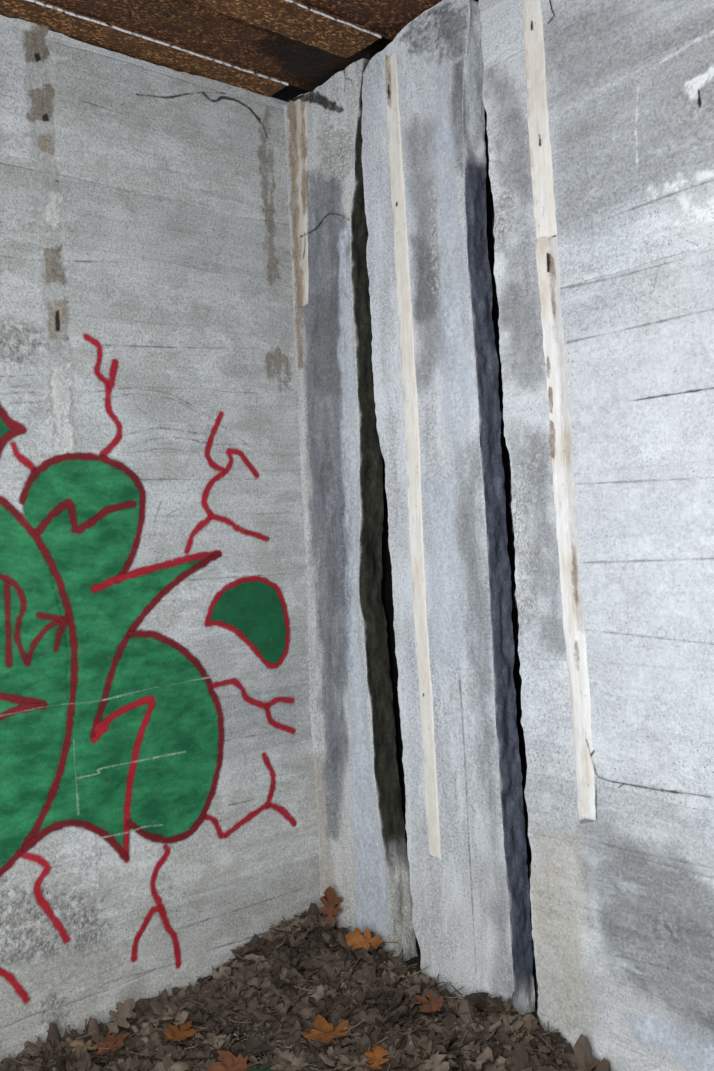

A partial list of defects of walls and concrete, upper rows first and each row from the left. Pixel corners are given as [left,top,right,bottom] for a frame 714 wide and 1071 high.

crack [136,92,267,137]
water stain [551,12,714,225]
water stain [303,126,389,949]
crack [381,455,407,843]
crack [484,107,538,1001]
crack [587,744,695,819]
water stain [589,825,714,1071]